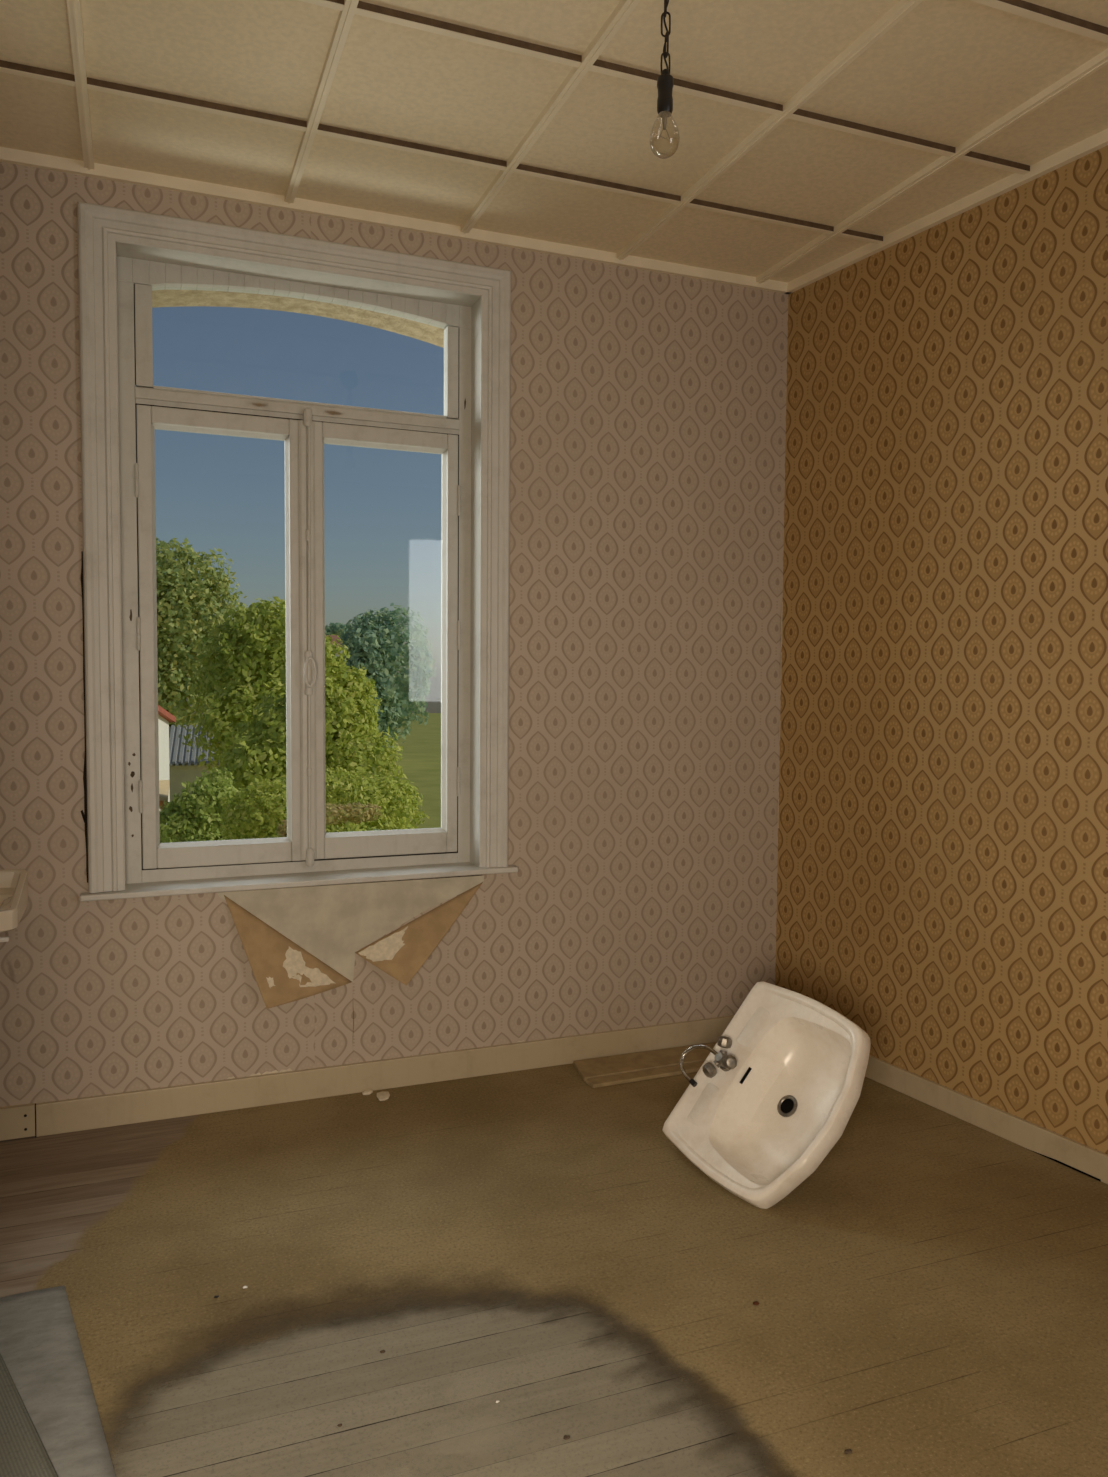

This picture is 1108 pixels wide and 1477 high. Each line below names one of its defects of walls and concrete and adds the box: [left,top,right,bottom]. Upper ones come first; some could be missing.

flaking render [217,875,484,987]